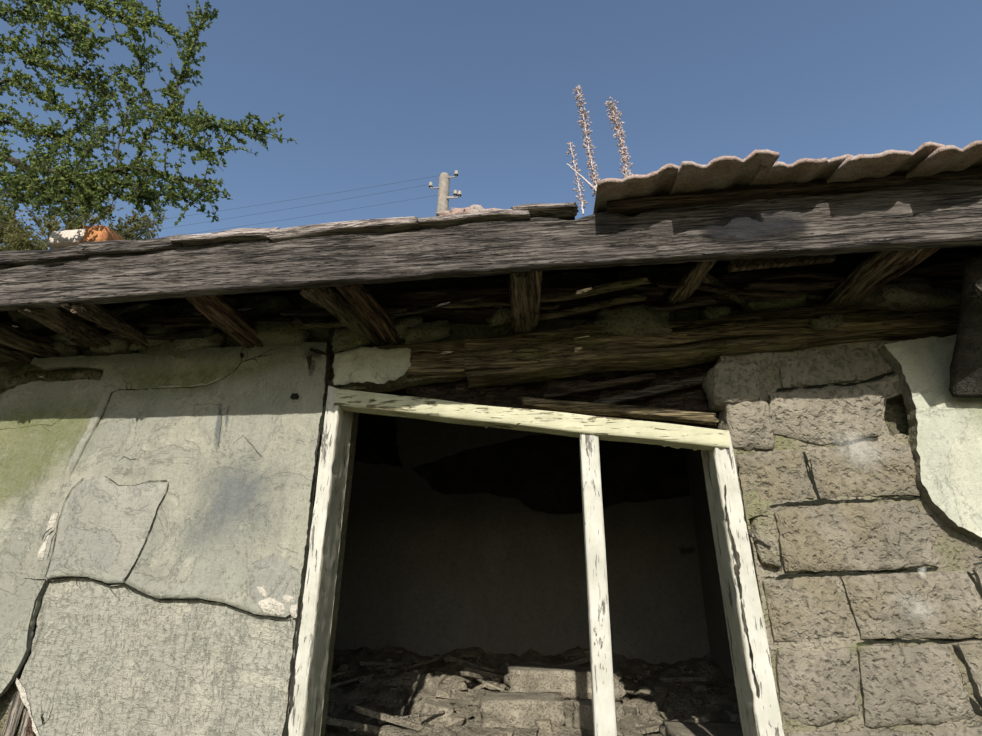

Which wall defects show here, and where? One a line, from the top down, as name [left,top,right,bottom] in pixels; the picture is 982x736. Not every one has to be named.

crack [0,347,331,736]
spalling [884,398,909,436]